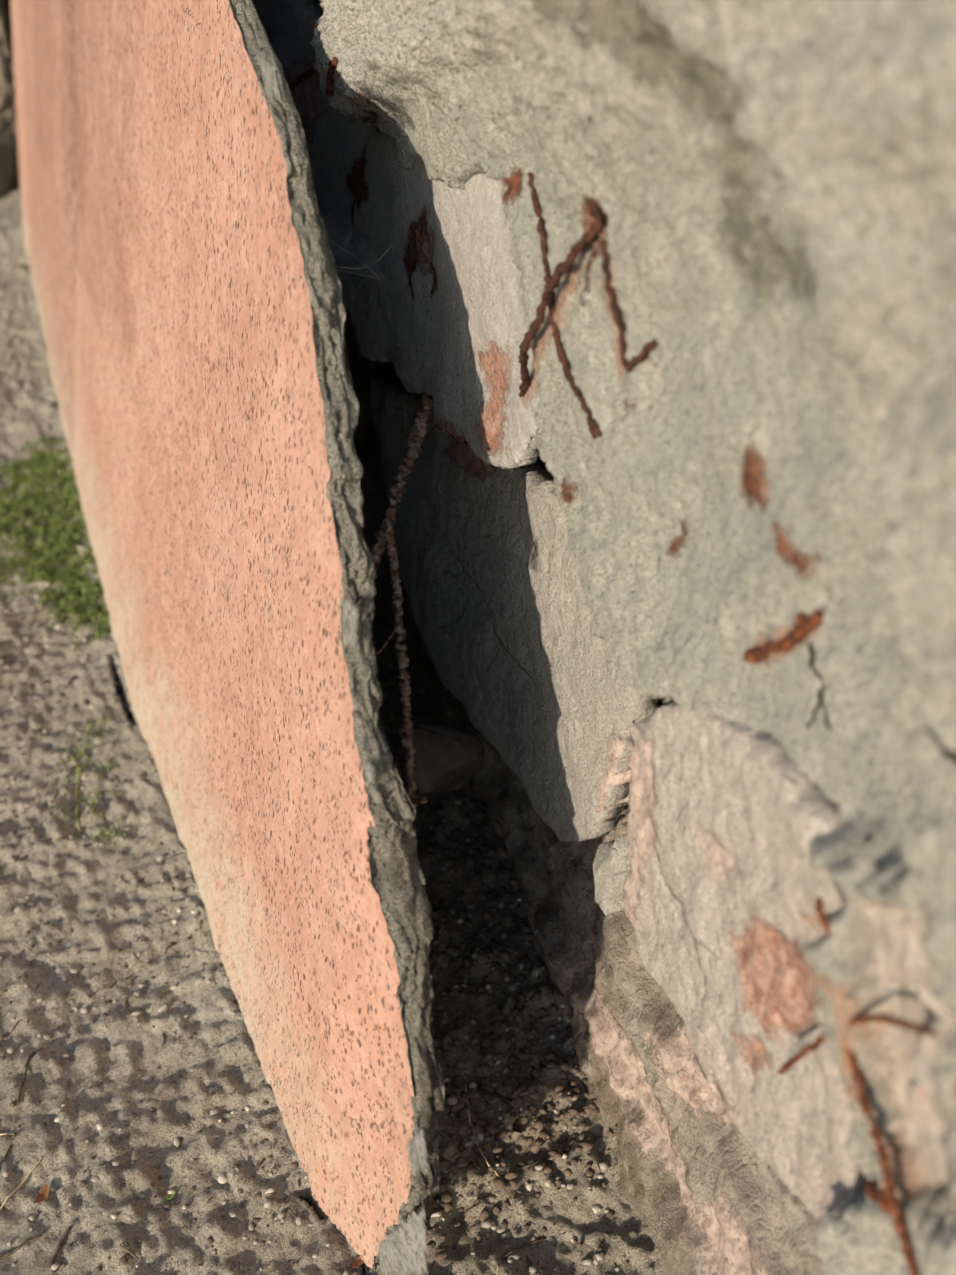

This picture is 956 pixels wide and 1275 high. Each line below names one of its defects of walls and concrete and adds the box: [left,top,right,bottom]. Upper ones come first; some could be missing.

rust [346,147,369,245]
rust [502,167,523,202]
rust [403,206,437,300]
rust [522,198,625,403]
rust [560,477,577,503]
rust [668,520,687,554]
rust [740,445,821,575]
spalling [229,0,956,1275]
crack [925,728,956,764]
rust [803,958,924,1230]